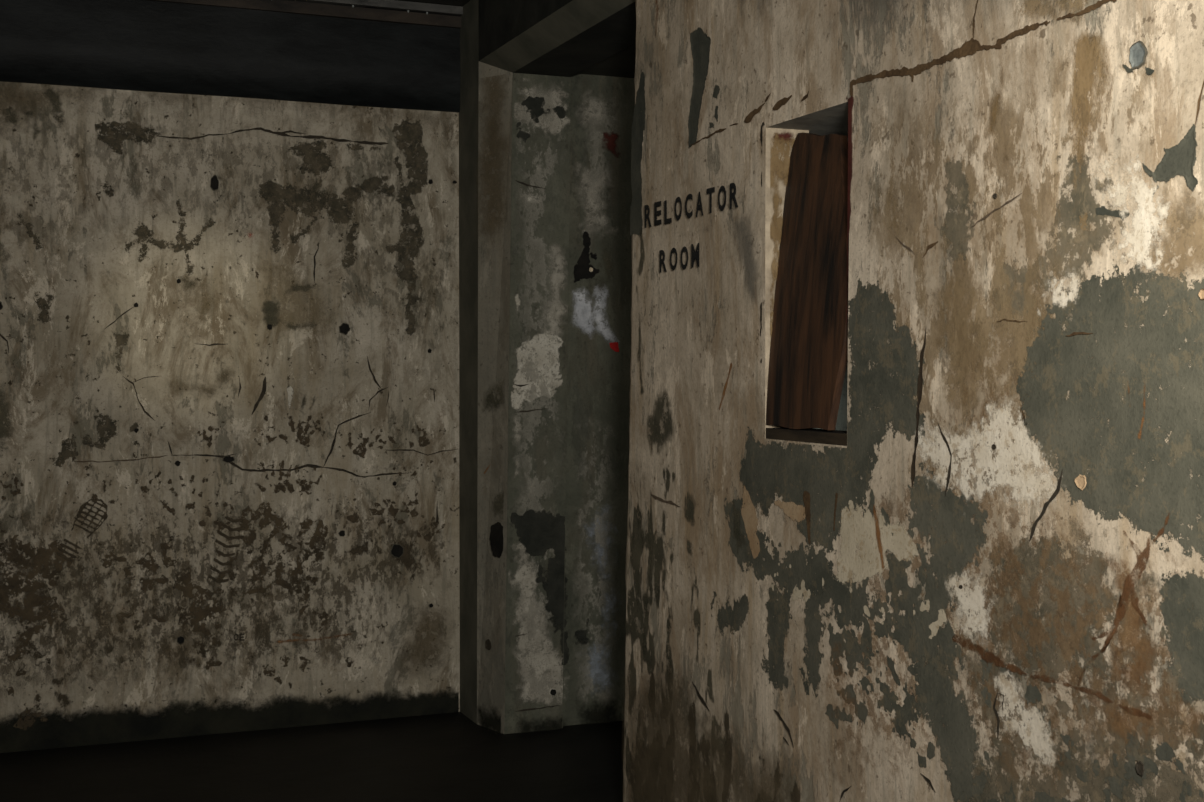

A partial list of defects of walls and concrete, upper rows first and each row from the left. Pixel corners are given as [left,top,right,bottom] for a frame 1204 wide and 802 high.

crack [850,0,1117,96]
crack [158,127,388,145]
crack [691,91,809,145]
peeling [1142,124,1198,196]
peeling [1096,206,1130,221]
leakage [262,301,311,330]
crack [73,357,456,478]
peeling [724,278,1071,802]
crack [1029,469,1063,542]
peeling [1016,259,1204,705]
peeling [625,468,675,780]
peeling [692,580,749,660]